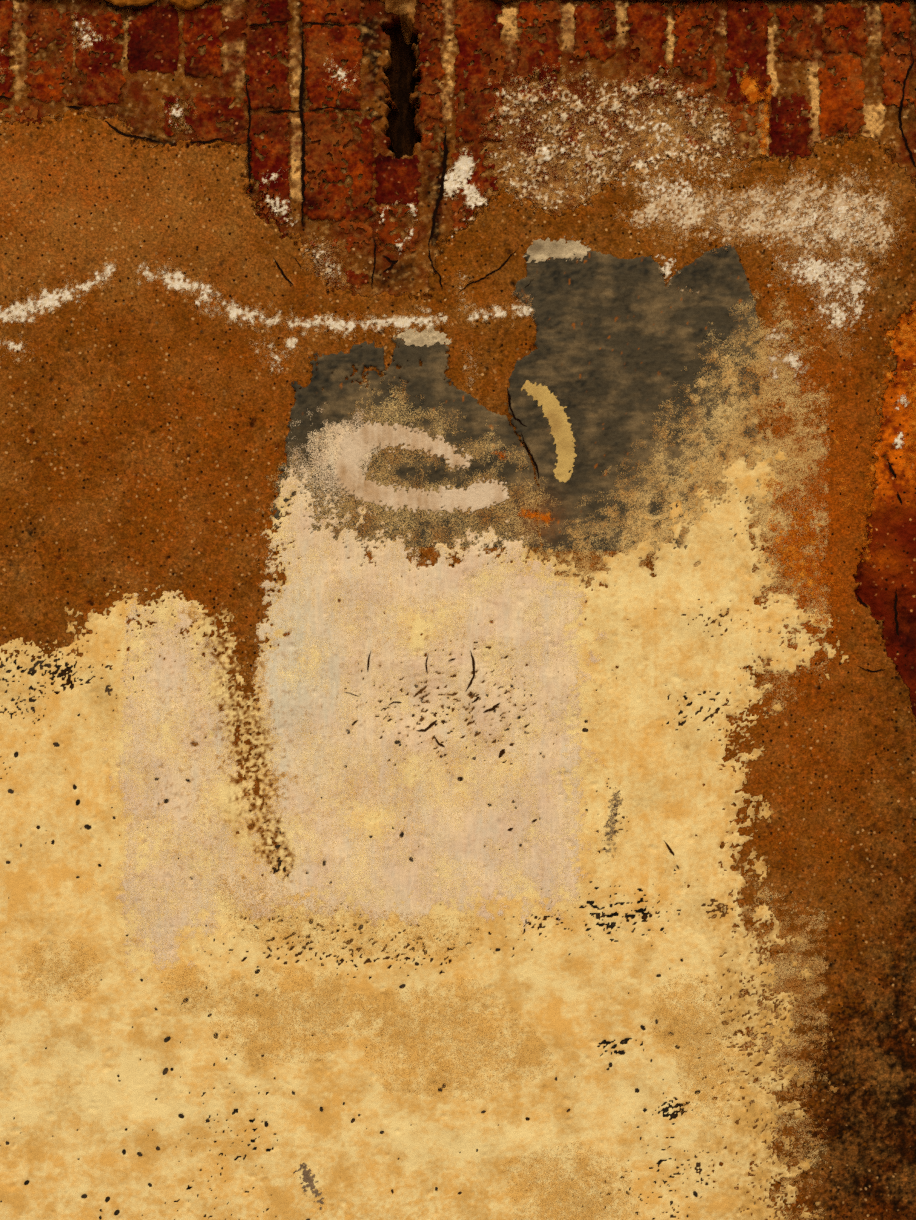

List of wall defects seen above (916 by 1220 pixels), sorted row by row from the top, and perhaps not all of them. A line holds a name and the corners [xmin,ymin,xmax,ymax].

efflorescence [0,261,117,365]
efflorescence [295,233,358,292]
efflorescence [131,257,534,378]
spalling [0,0,916,300]
efflorescence [444,56,907,401]
rust [836,301,916,565]
peeling [0,245,849,1220]